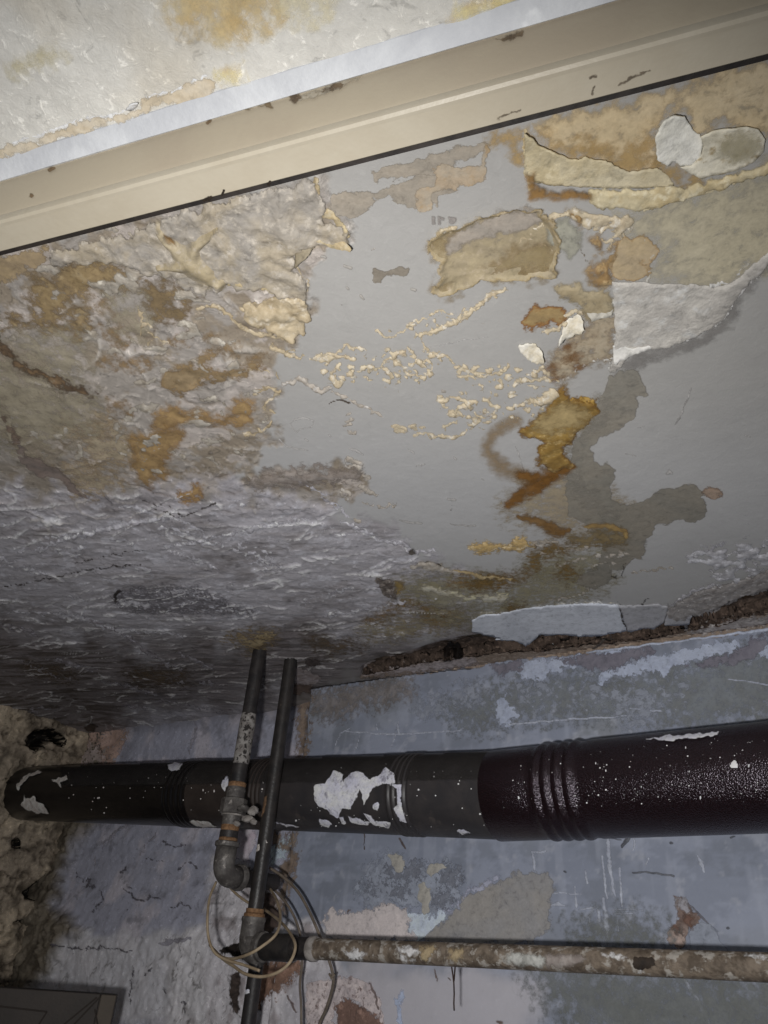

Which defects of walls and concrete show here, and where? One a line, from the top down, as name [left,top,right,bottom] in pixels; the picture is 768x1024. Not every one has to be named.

water stain [173,0,328,44]
peeling [0,115,768,440]
peeling [141,358,282,468]
rust [448,236,628,595]
flaking render [245,456,396,509]
water stain [301,286,750,660]
peeling [360,540,768,735]
flaking render [320,848,556,945]
spalling [667,896,701,949]